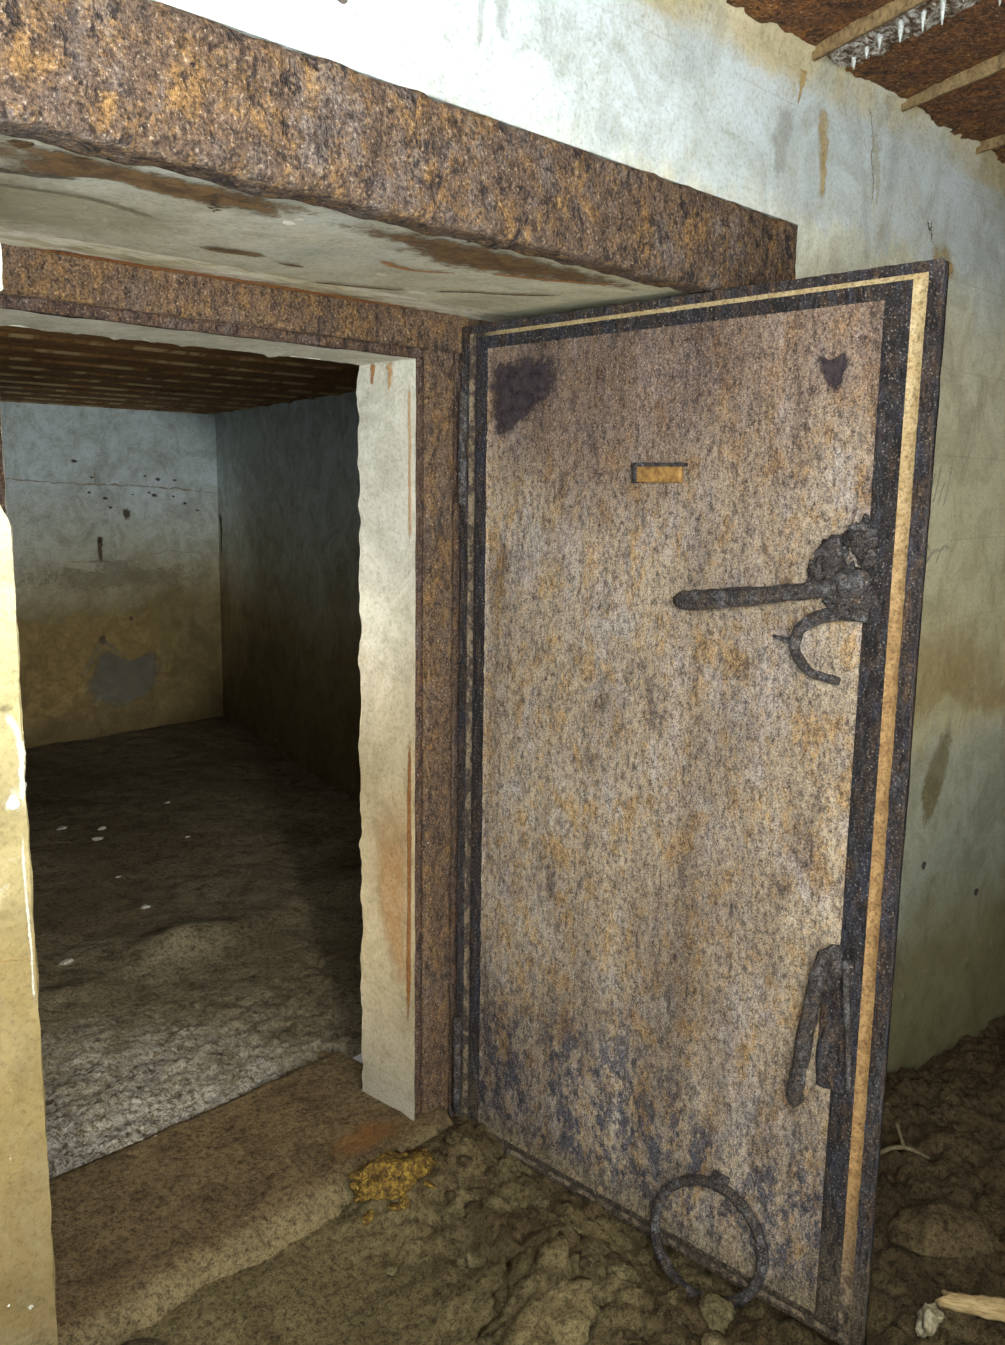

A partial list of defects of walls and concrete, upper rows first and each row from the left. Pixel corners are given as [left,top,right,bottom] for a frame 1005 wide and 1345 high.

corrosion [819,112,828,195]
damp [923,736,948,818]